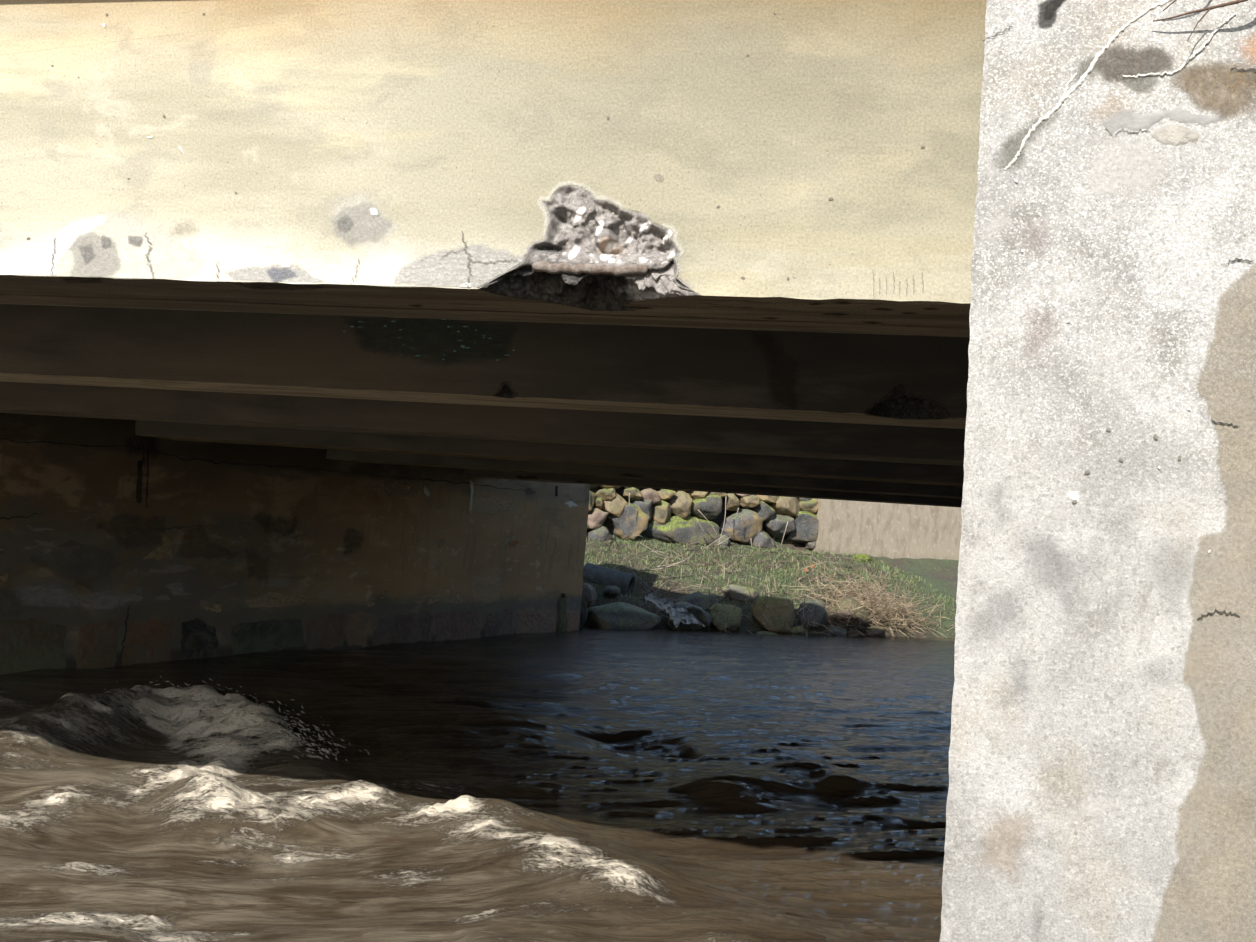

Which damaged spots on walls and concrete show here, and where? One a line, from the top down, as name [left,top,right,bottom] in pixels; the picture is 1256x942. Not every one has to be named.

water stain [1097,47,1171,91]
crack [144,232,154,279]
crack [440,231,517,290]
spalling [477,181,701,311]
water stain [1185,381,1256,688]
crack [1197,609,1240,620]
water stain [1165,773,1255,942]